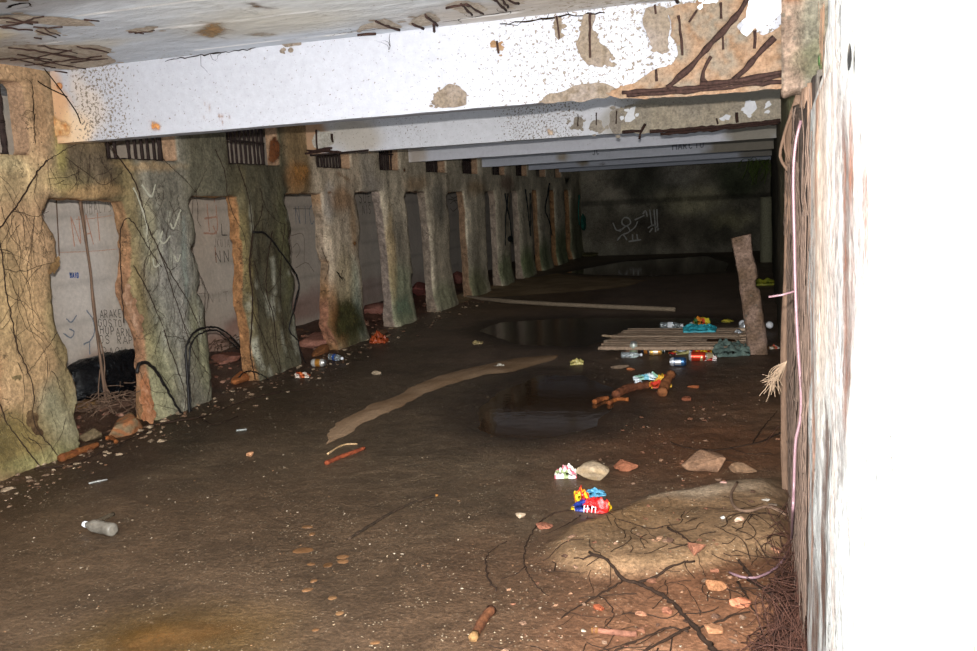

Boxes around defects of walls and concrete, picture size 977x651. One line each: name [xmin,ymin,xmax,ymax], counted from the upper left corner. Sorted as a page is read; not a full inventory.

spalling [357,0,525,36]
peeling [490,40,505,57]
spalling [539,0,782,139]
peeling [429,83,469,108]
damp [336,301,362,337]